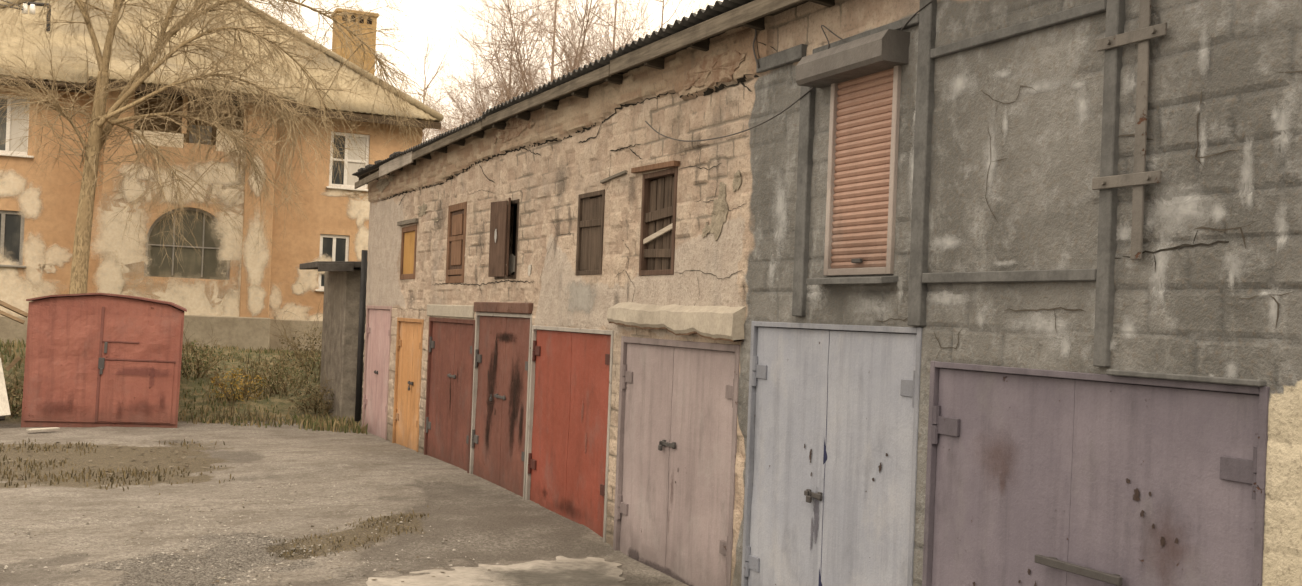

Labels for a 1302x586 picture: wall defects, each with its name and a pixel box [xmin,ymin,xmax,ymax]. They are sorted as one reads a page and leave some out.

crack [384,38,776,205]
peeling [0,170,72,316]
peeling [92,145,332,321]
peeling [323,174,394,260]
crack [674,269,744,306]
crack [681,157,742,222]
crack [1115,222,1254,269]
crack [1239,292,1292,326]
leakage [485,334,512,445]
leakage [510,366,523,442]